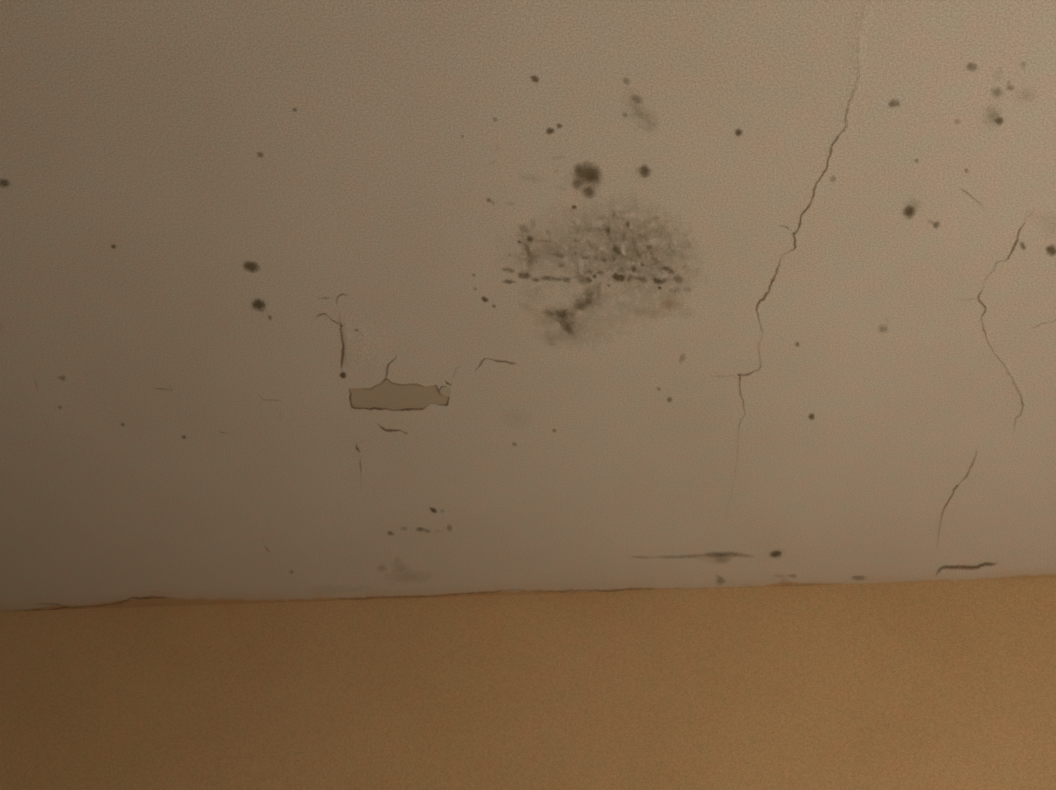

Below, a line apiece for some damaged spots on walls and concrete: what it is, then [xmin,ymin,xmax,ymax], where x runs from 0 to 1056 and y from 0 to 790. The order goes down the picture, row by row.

leakage [494,155,710,352]
crack [323,313,346,378]
peeling [349,364,451,411]
crack [939,562,992,570]